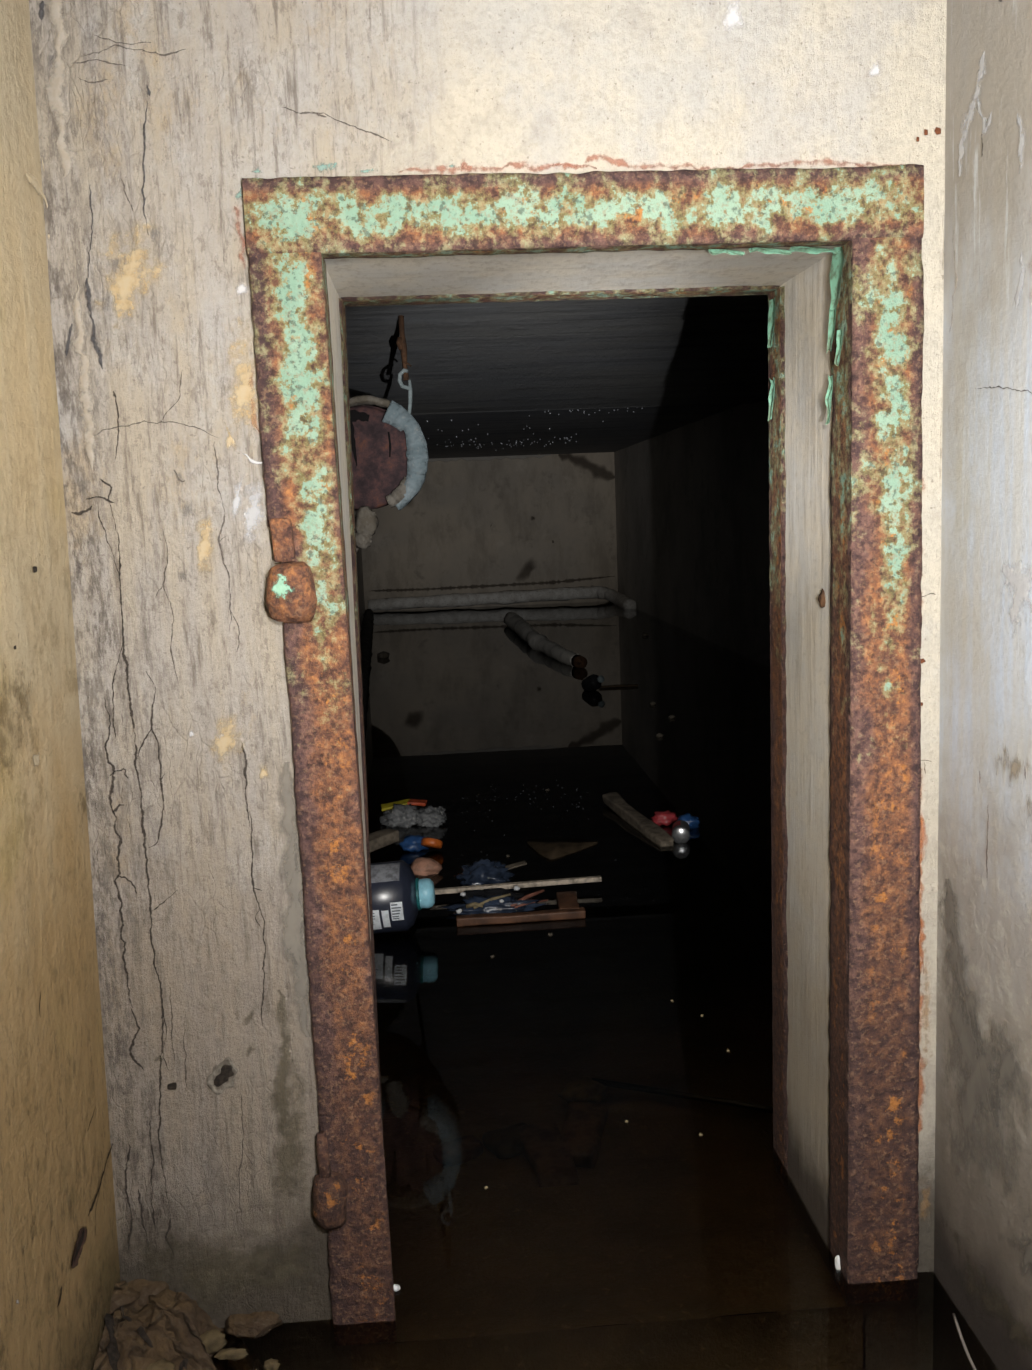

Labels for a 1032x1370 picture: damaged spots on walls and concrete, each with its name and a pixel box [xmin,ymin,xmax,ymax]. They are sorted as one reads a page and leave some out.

crack [37,1,45,20]
crack [283,107,389,141]
rust [400,155,709,174]
rust [727,159,902,169]
crack [65,35,240,1256]
crack [242,743,266,1024]
crack [238,1093,252,1228]